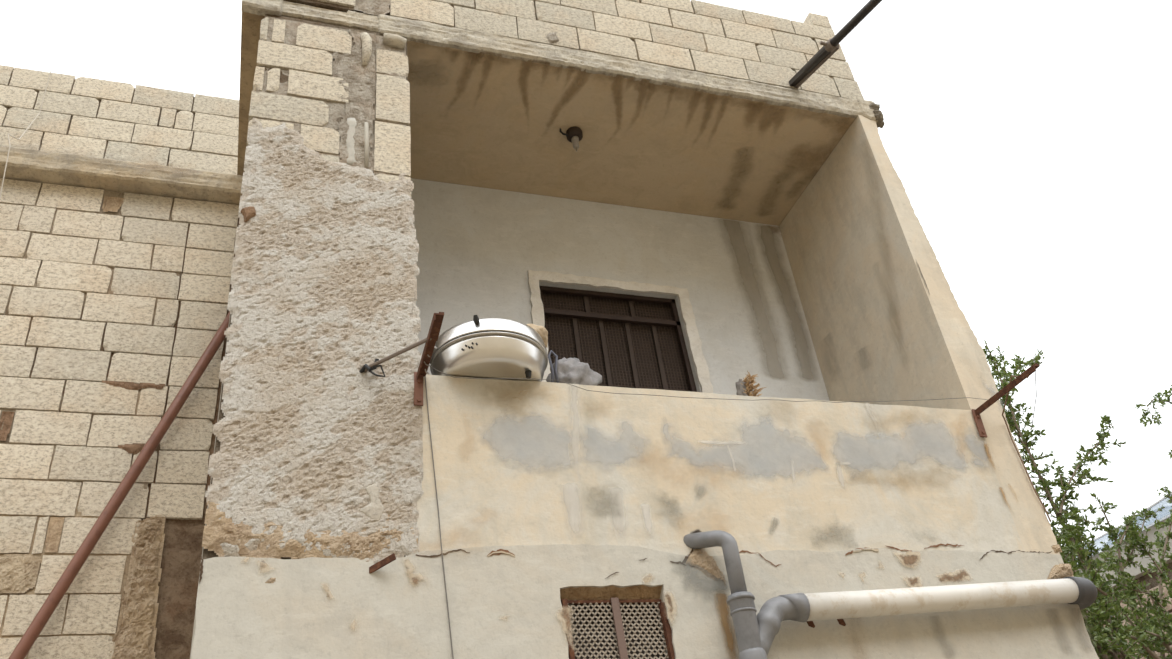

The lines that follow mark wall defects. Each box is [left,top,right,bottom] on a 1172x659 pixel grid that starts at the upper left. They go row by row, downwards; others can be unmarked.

water stain [723,149,784,378]
spalling [202,118,424,584]
peeling [102,380,165,390]
peeling [118,443,145,454]
peeling [110,515,166,659]
spalling [686,548,726,586]
spalling [895,551,922,588]
crack [845,543,1052,559]
spalling [937,571,970,581]